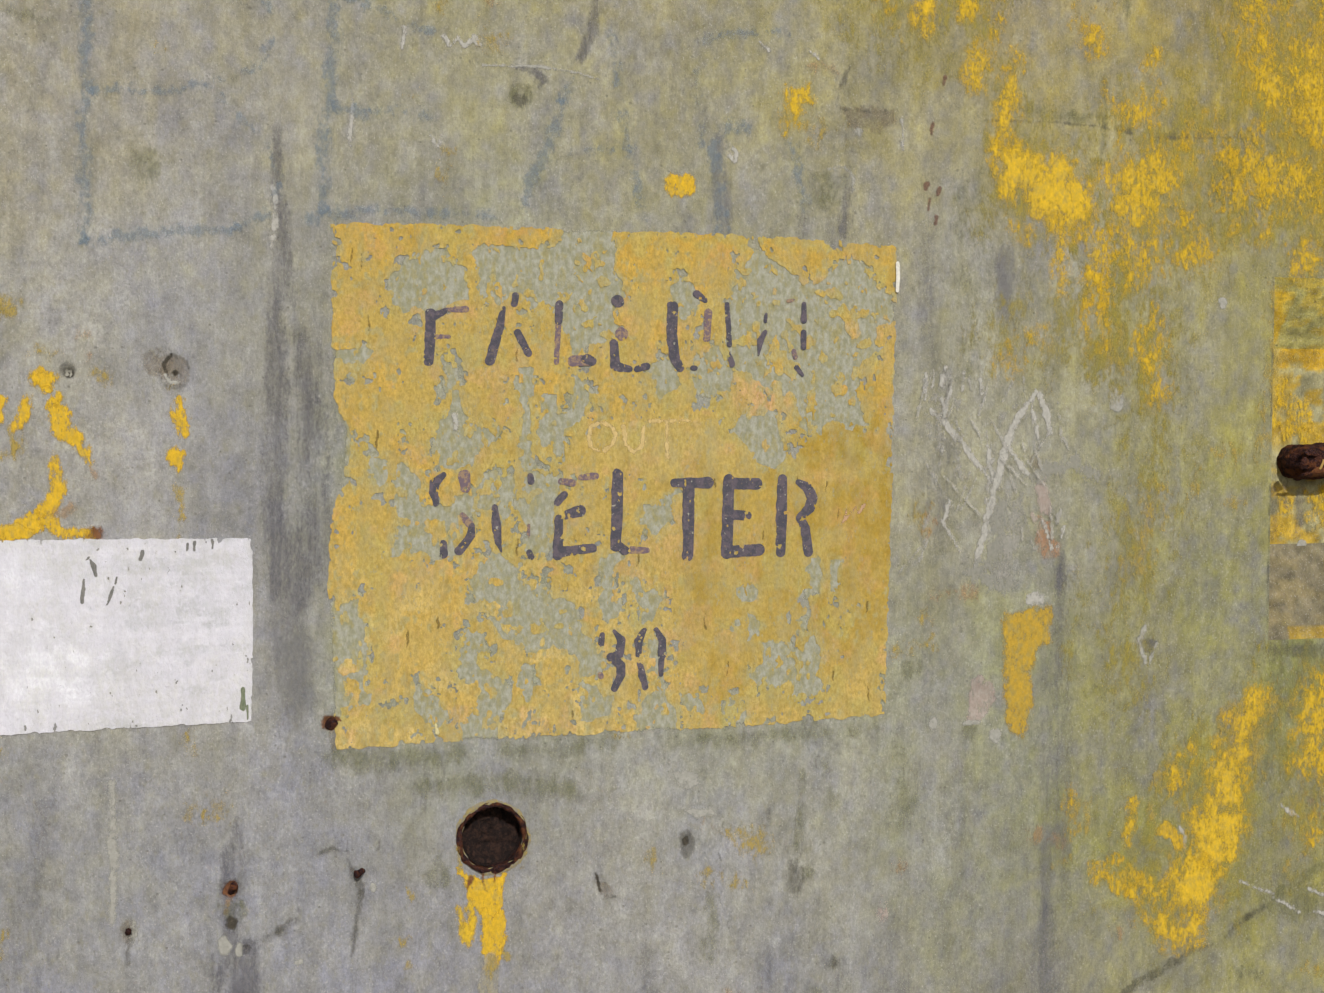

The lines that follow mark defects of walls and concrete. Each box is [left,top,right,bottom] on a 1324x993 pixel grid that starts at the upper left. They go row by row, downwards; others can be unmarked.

peeling [986,0,1324,309]
peeling [30,371,74,387]
peeling [387,230,630,355]
peeling [643,236,897,469]
corrosion [1277,442,1324,481]
peeling [88,527,103,540]
peeling [367,361,614,739]
peeling [331,591,372,718]
peeling [593,551,705,731]
peeling [728,556,844,699]
peeling [1286,668,1324,783]
peeling [1087,686,1276,951]